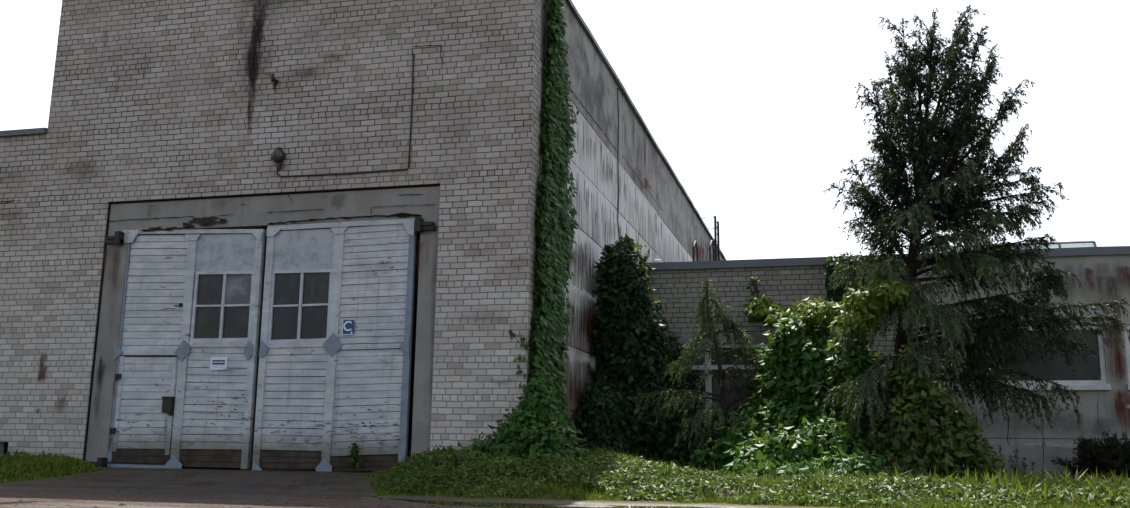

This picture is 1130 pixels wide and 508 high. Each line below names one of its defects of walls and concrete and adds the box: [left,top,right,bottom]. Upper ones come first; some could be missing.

water stain [246,2,267,85]
water stain [570,103,662,242]
spalling [148,216,227,231]
corrosion [1101,306,1124,378]